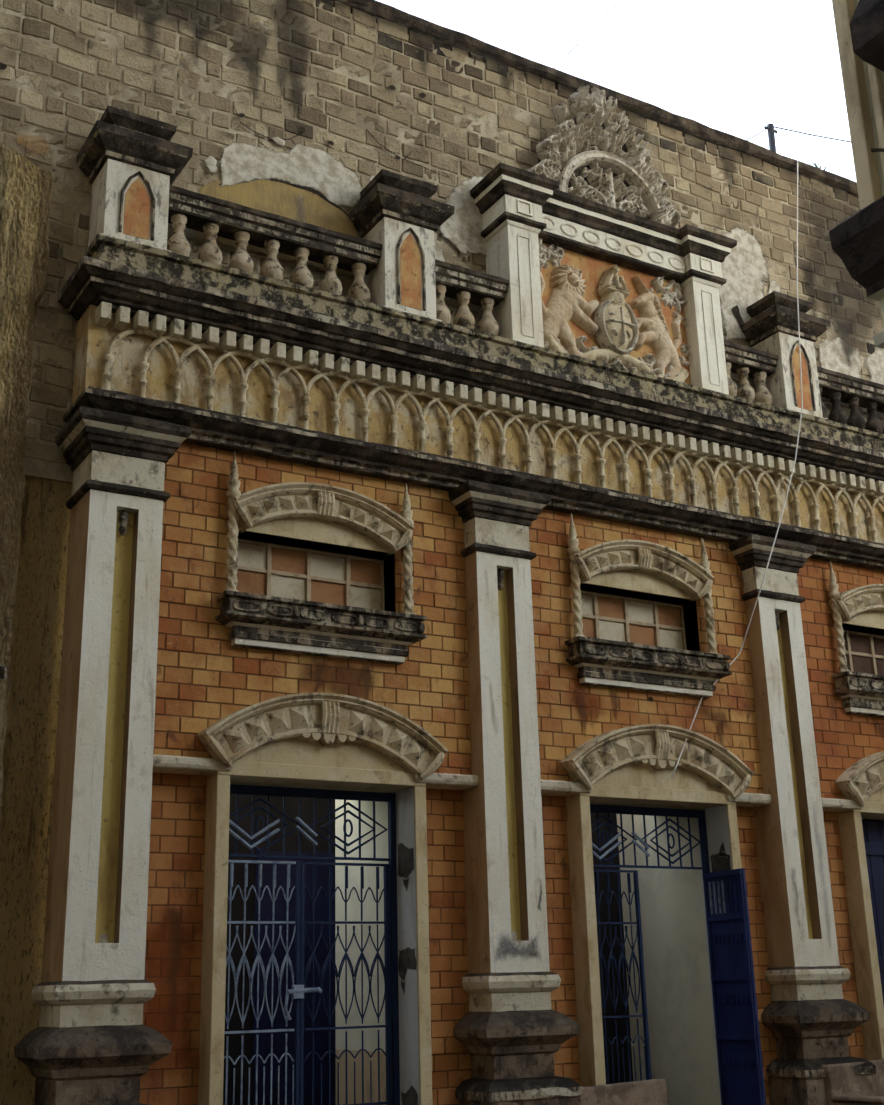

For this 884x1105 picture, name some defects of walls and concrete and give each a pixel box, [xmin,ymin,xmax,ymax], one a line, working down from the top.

damp [122,0,308,116]
peeling [200,127,375,237]
peeling [398,843,414,891]
peeling [398,947,417,994]
peeling [401,1085,418,1105]